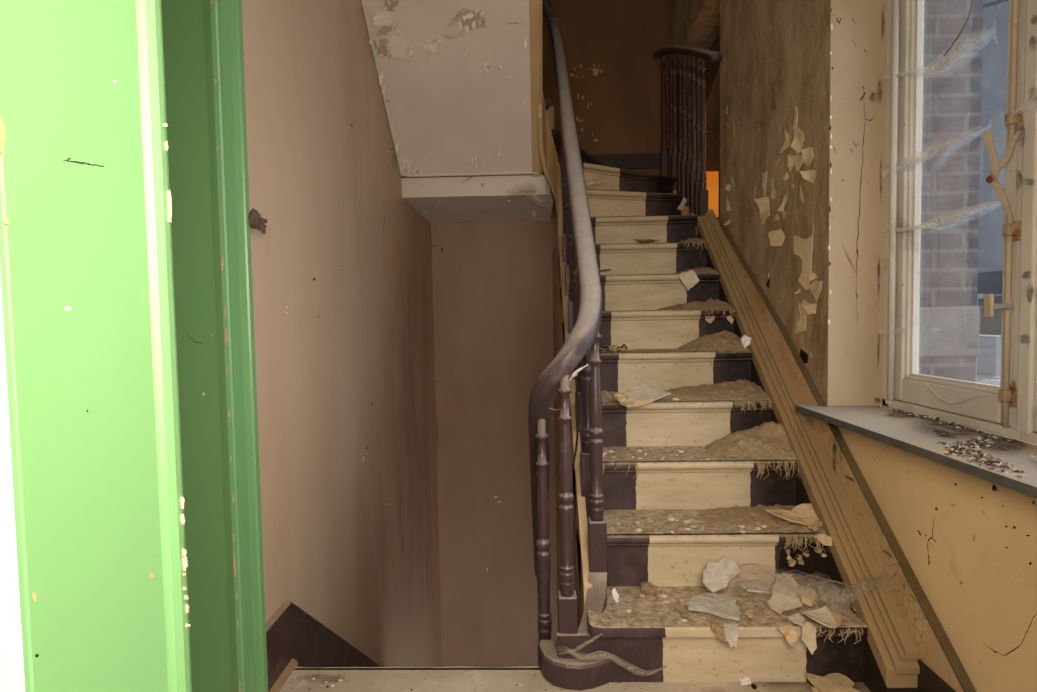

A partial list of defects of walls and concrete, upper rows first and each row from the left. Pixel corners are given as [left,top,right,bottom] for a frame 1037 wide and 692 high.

peeling [458,6,487,35]
peeling [752,107,822,334]
peeling [182,549,190,627]
crack [985,614,1036,656]